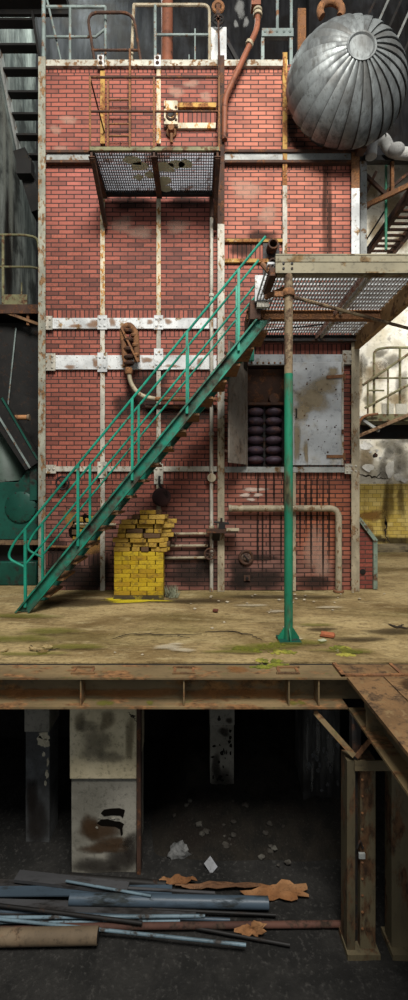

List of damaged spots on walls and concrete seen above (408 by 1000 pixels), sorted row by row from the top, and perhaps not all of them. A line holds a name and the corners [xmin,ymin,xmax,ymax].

leakage [360,351,397,404]
leakage [390,379,406,405]
leakage [360,439,408,477]
leakage [383,488,403,527]
rust [0,689,176,697]
rust [193,689,284,697]
peeling [37,732,50,786]
leakage [78,834,137,873]